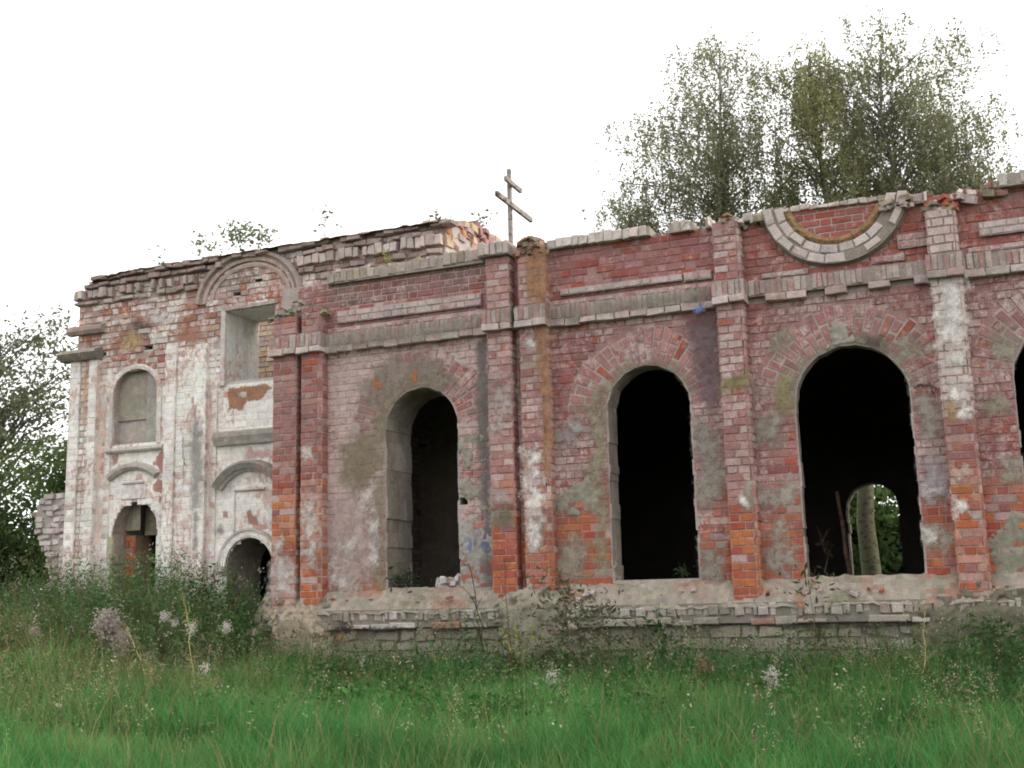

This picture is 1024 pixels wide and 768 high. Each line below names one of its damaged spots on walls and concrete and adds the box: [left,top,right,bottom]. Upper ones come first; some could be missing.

peeling [227,384,271,410]
water stain [340,431,377,490]
water stain [522,449,543,547]